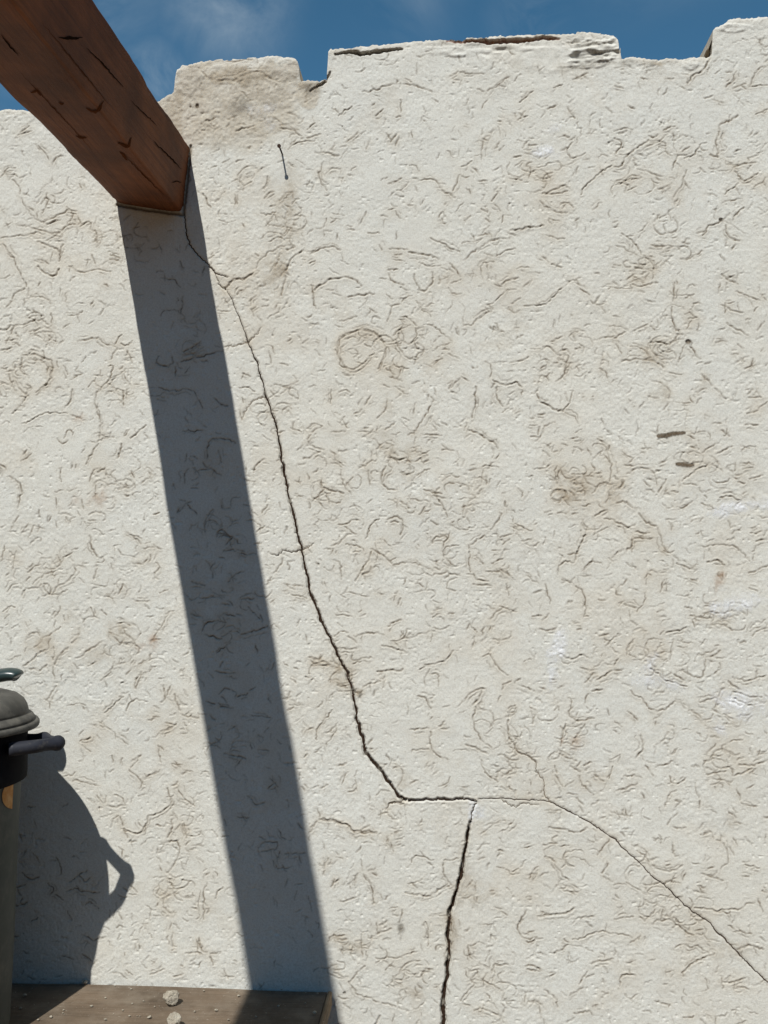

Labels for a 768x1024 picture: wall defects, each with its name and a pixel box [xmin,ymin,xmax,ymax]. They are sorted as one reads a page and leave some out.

crack [184,215,768,1024]